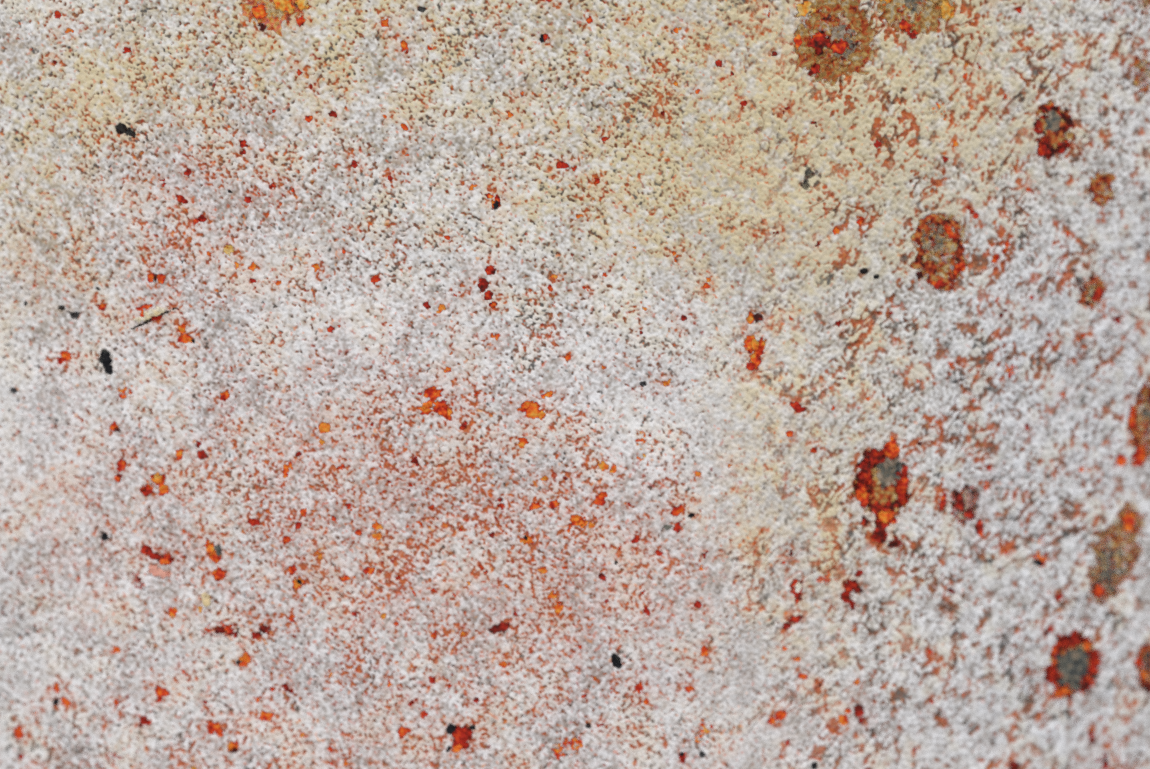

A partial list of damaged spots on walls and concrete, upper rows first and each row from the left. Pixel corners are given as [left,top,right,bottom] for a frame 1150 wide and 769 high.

corrosion [240,0,309,36]
corrosion [793,0,956,86]
corrosion [1034,101,1076,159]
corrosion [910,205,979,291]
corrosion [417,386,467,430]
corrosion [517,391,553,420]
corrosion [1112,379,1150,467]
corrosion [140,472,169,497]
corrosion [851,436,912,548]
corrosion [204,539,226,581]
corrosion [1040,625,1102,700]
corrosion [207,721,238,753]